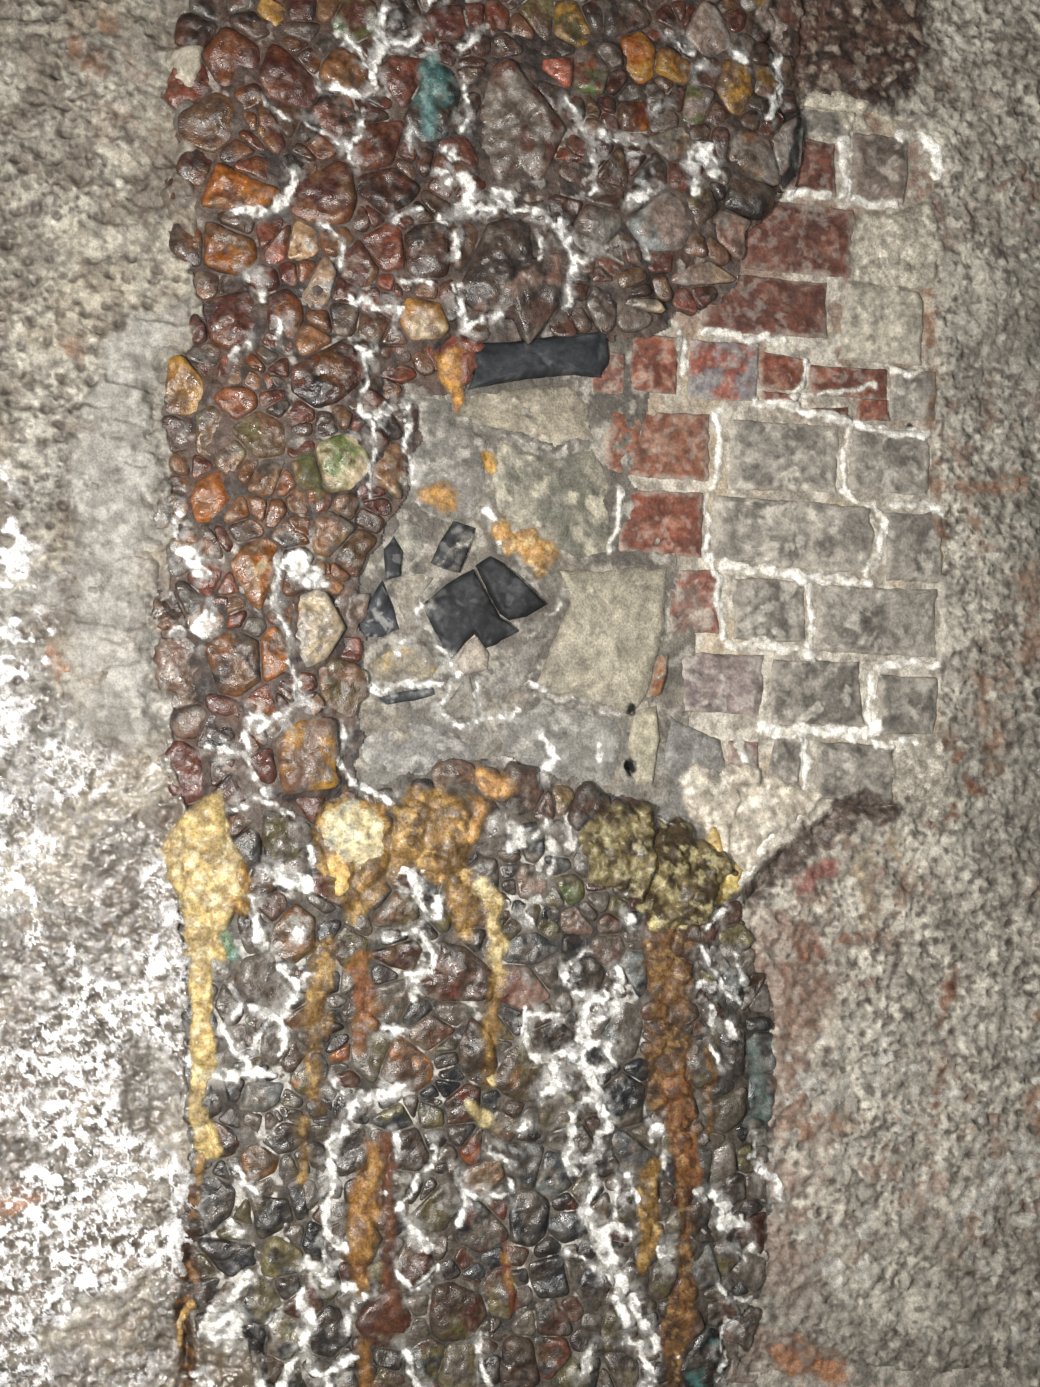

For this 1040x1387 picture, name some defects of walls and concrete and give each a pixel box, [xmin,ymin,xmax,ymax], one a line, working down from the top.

leakage [264,6,437,165]
leakage [392,83,609,307]
leakage [702,357,945,662]
spalling [151,0,934,1387]
spalling [604,103,1018,1387]
crack [173,1185,201,1387]
leakage [0,658,577,1387]
corrosion [297,938,377,1184]
corrosion [346,1132,403,1387]
corrosion [465,1100,493,1127]
leakage [521,950,661,1387]
corrosion [637,912,718,1387]